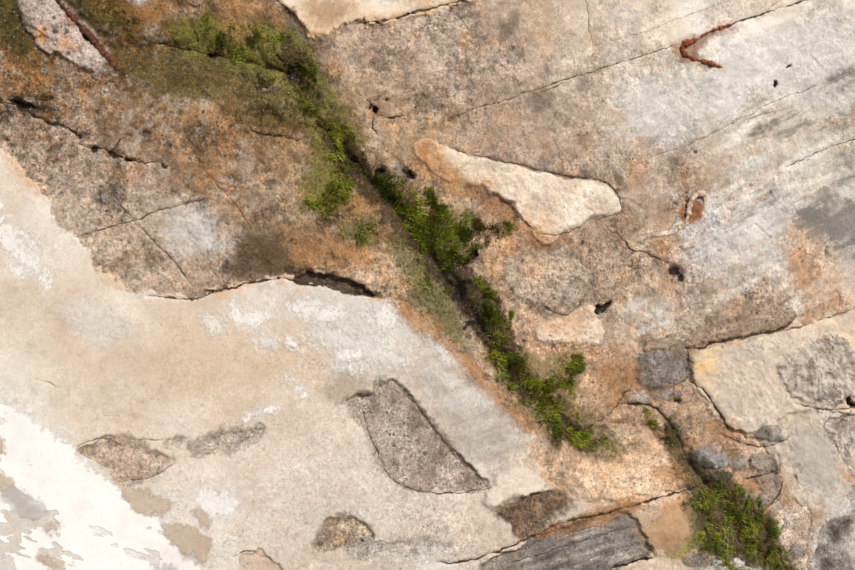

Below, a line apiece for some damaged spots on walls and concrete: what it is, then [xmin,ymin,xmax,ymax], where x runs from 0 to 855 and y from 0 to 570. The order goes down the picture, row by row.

rust [57,0,118,71]
crack [456,0,730,117]
crack [726,0,807,29]
crack [0,98,159,169]
crack [644,68,855,159]
crack [76,164,381,300]
flaking render [413,138,621,245]
flaking render [534,304,605,345]
flaking render [689,308,855,474]
peeling [0,385,266,570]
spalling [344,379,652,570]
spalling [773,490,855,570]